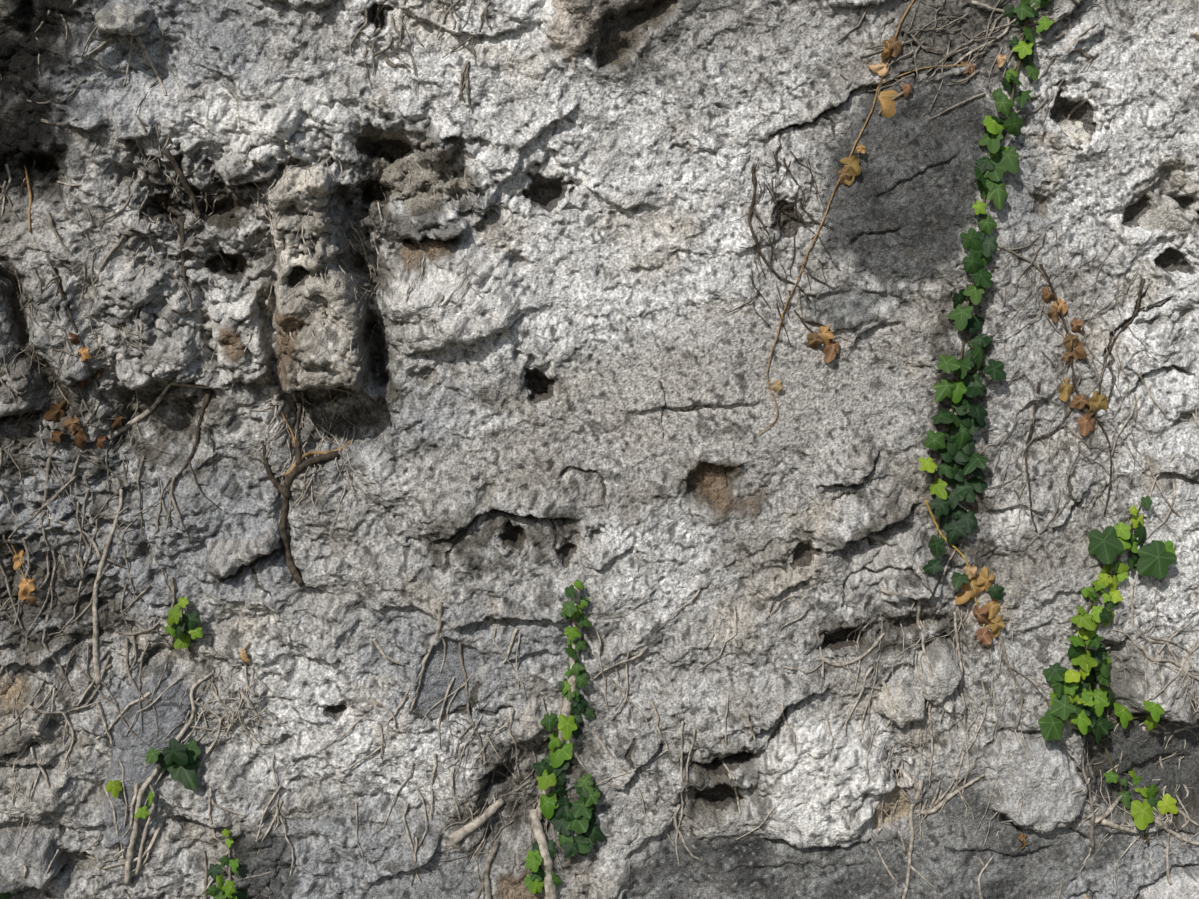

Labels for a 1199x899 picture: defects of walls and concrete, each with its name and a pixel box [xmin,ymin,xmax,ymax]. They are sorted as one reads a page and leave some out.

crack [759,87,860,177]